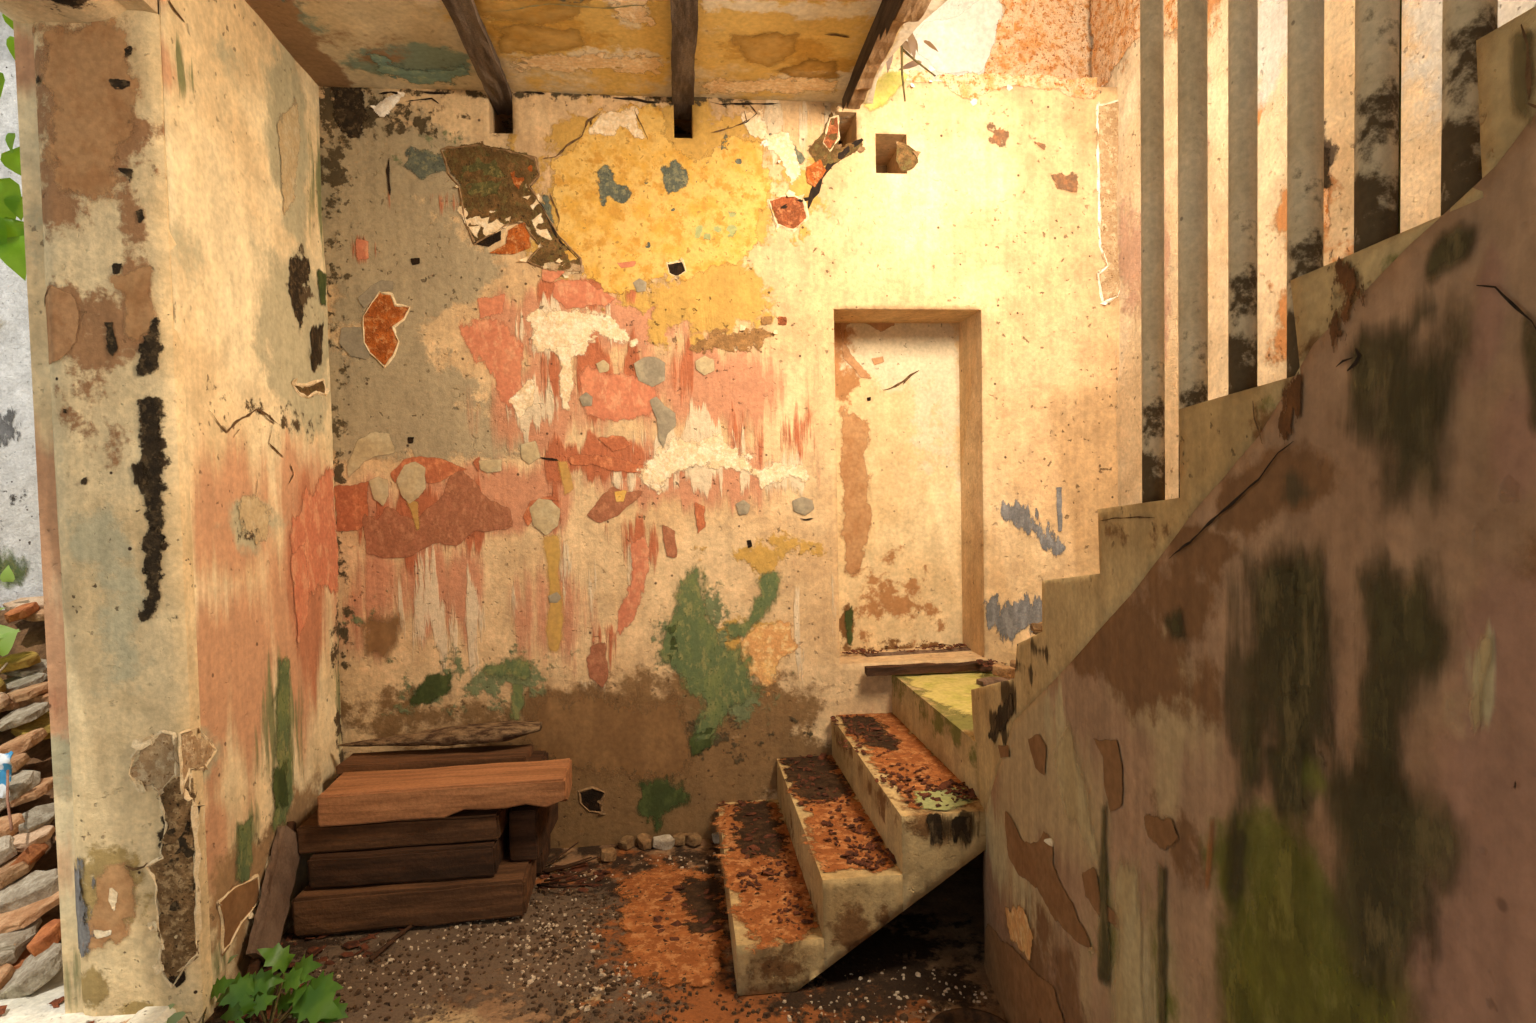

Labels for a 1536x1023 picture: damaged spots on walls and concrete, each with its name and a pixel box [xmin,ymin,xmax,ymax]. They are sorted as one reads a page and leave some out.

leakage [32,0,141,203]
flaking render [289,256,410,398]
peeling [441,102,866,309]
crack [1476,285,1536,329]
leakage [131,462,148,486]
leakage [138,525,165,622]
peeling [290,437,558,643]
peeling [568,365,660,523]
crack [1169,401,1294,559]
spalling [128,726,261,989]
leakage [481,566,780,833]
leakage [1333,557,1459,995]